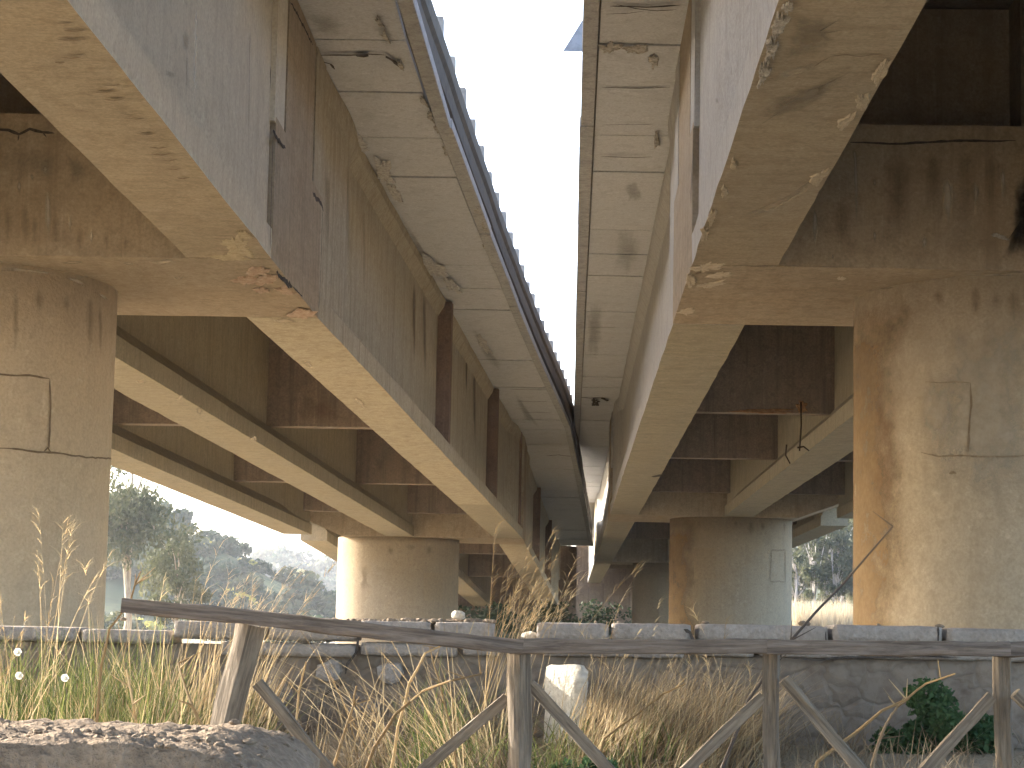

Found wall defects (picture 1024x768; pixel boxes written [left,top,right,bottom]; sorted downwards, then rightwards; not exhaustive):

spalling [598,41,659,70]
spalling [837,58,892,131]
crack [0,128,54,140]
crack [850,138,1016,146]
spalling [809,167,830,187]
spalling [210,230,296,295]
spalling [686,262,733,289]
crack [0,373,111,459]
spalling [728,400,809,464]
crack [921,381,1024,474]